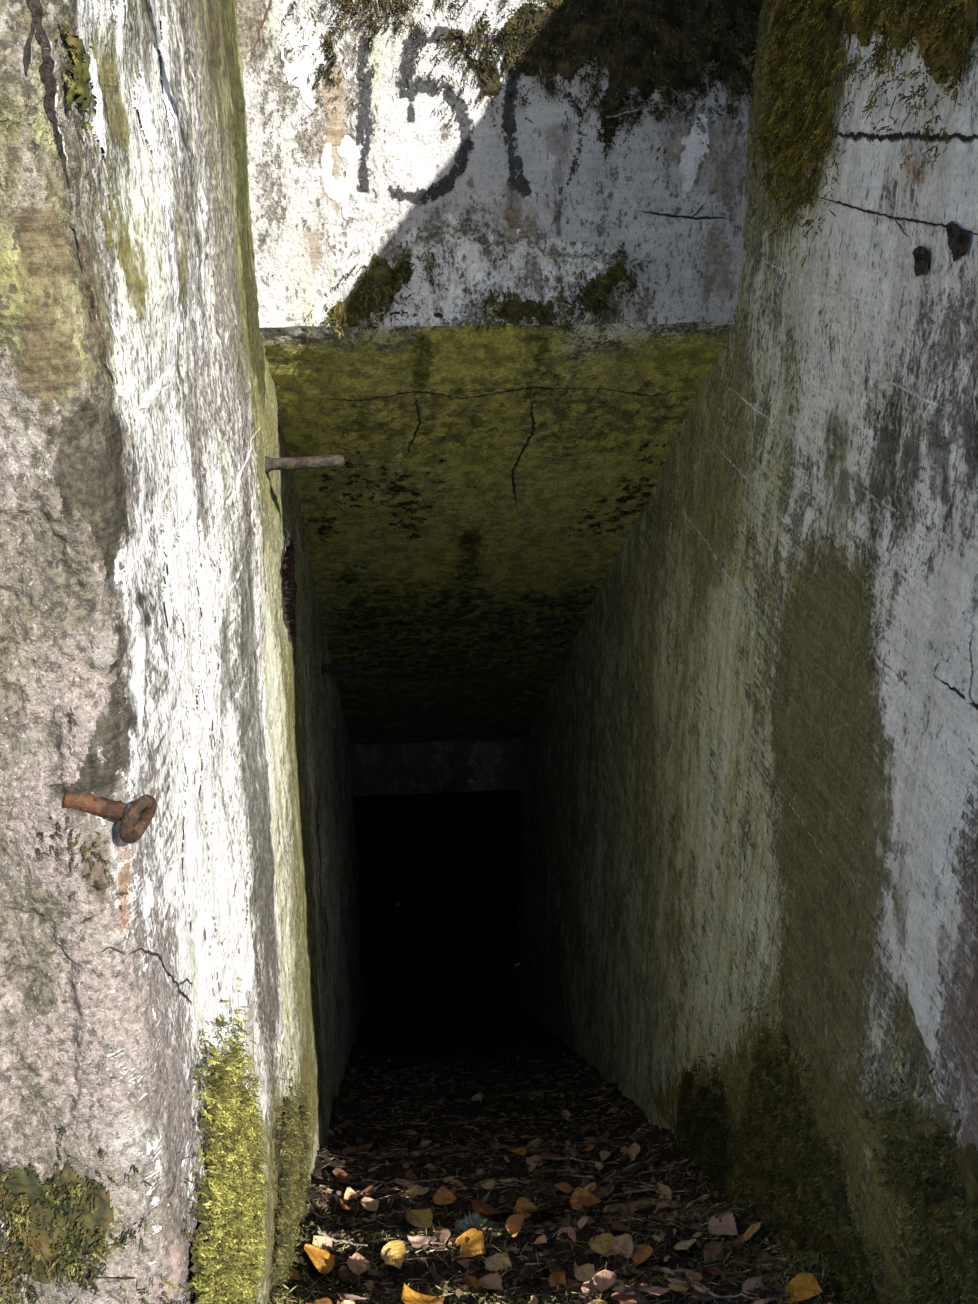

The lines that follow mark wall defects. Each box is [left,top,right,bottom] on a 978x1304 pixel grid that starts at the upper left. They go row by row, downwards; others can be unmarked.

crack [23,0,70,188]
corrosion [139,0,154,88]
peeling [279,20,328,111]
peeling [321,136,365,220]
peeling [678,114,710,200]
crack [818,197,978,237]
crack [833,131,978,144]
crack [70,223,115,389]
corrosion [265,455,345,473]
crack [317,386,683,511]
crack [933,674,978,710]
crack [99,946,193,1006]